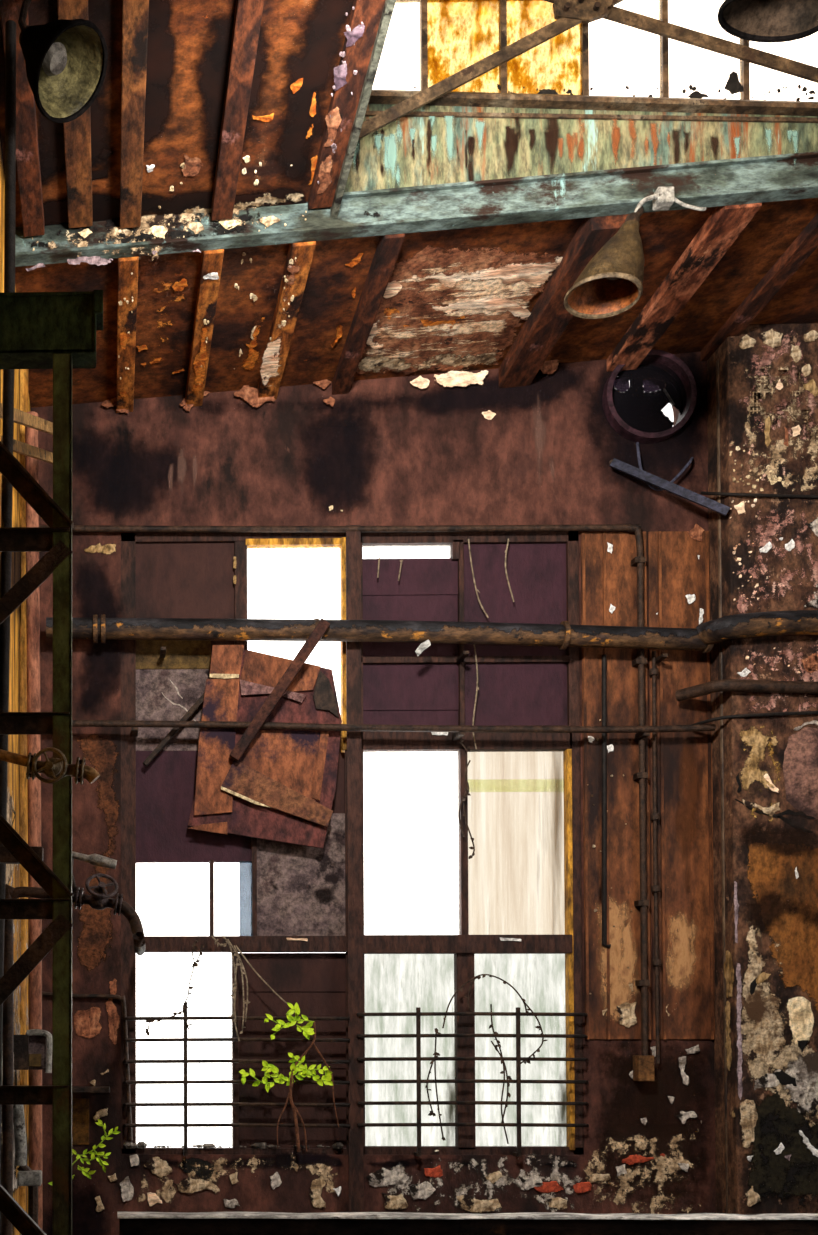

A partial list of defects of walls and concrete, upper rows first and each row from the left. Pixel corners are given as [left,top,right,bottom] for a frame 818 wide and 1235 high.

corrosion [355,127,385,172]
corrosion [412,119,432,174]
corrosion [457,131,475,182]
corrosion [504,118,585,174]
corrosion [612,119,690,165]
corrosion [711,136,719,160]
peeling [356,244,563,389]
water stain [72,434,180,514]
spalling [729,329,818,614]
spalling [679,1045,700,1086]
spalling [108,1141,344,1208]
spalling [366,1096,702,1214]